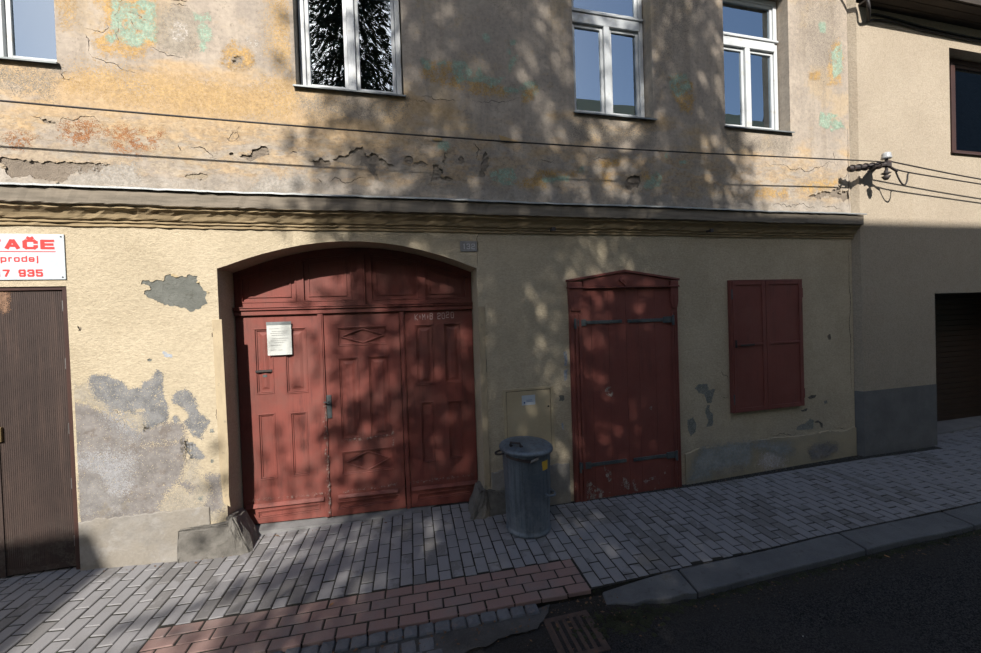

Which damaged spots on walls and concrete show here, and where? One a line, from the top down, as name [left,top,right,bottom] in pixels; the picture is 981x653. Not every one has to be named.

flaking render [0,157,110,183]
flaking render [229,146,269,162]
flaking render [309,146,453,181]
flaking render [800,176,849,202]
flaking render [141,274,209,312]
peeling [687,384,715,436]